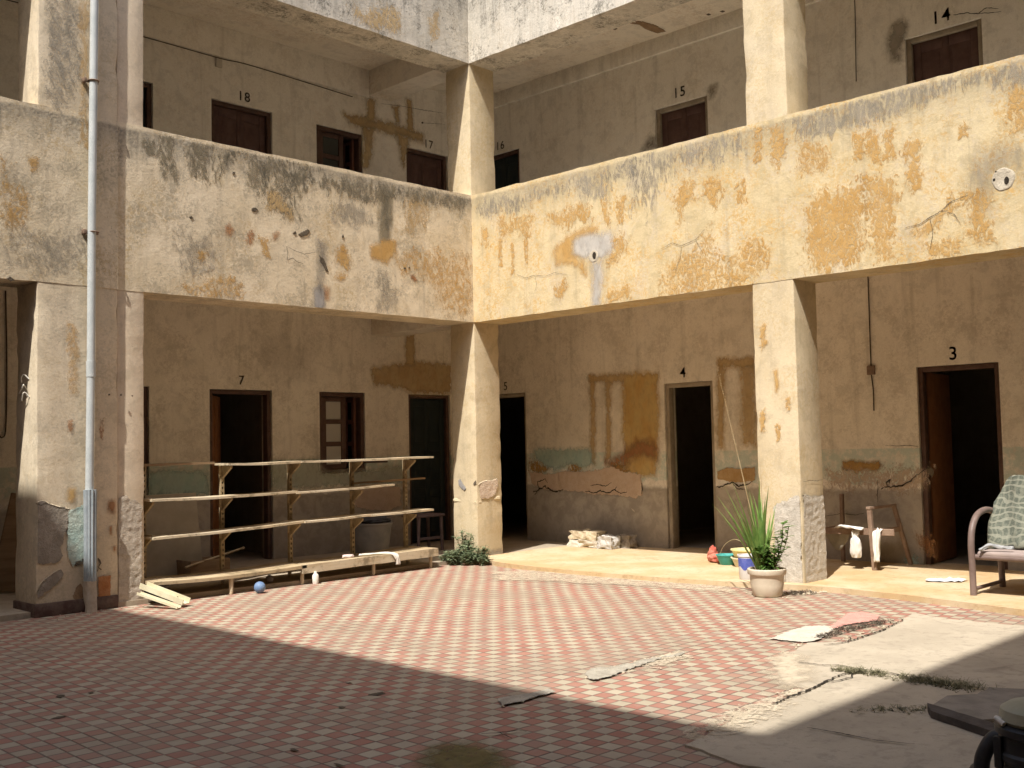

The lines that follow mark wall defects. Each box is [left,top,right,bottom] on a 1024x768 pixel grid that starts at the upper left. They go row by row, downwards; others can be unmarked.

water stain [142,99,633,319]
crack [906,195,967,249]
flaking render [528,449,643,499]
flaking render [717,467,755,482]
crack [828,445,931,516]
flaking render [35,500,84,599]